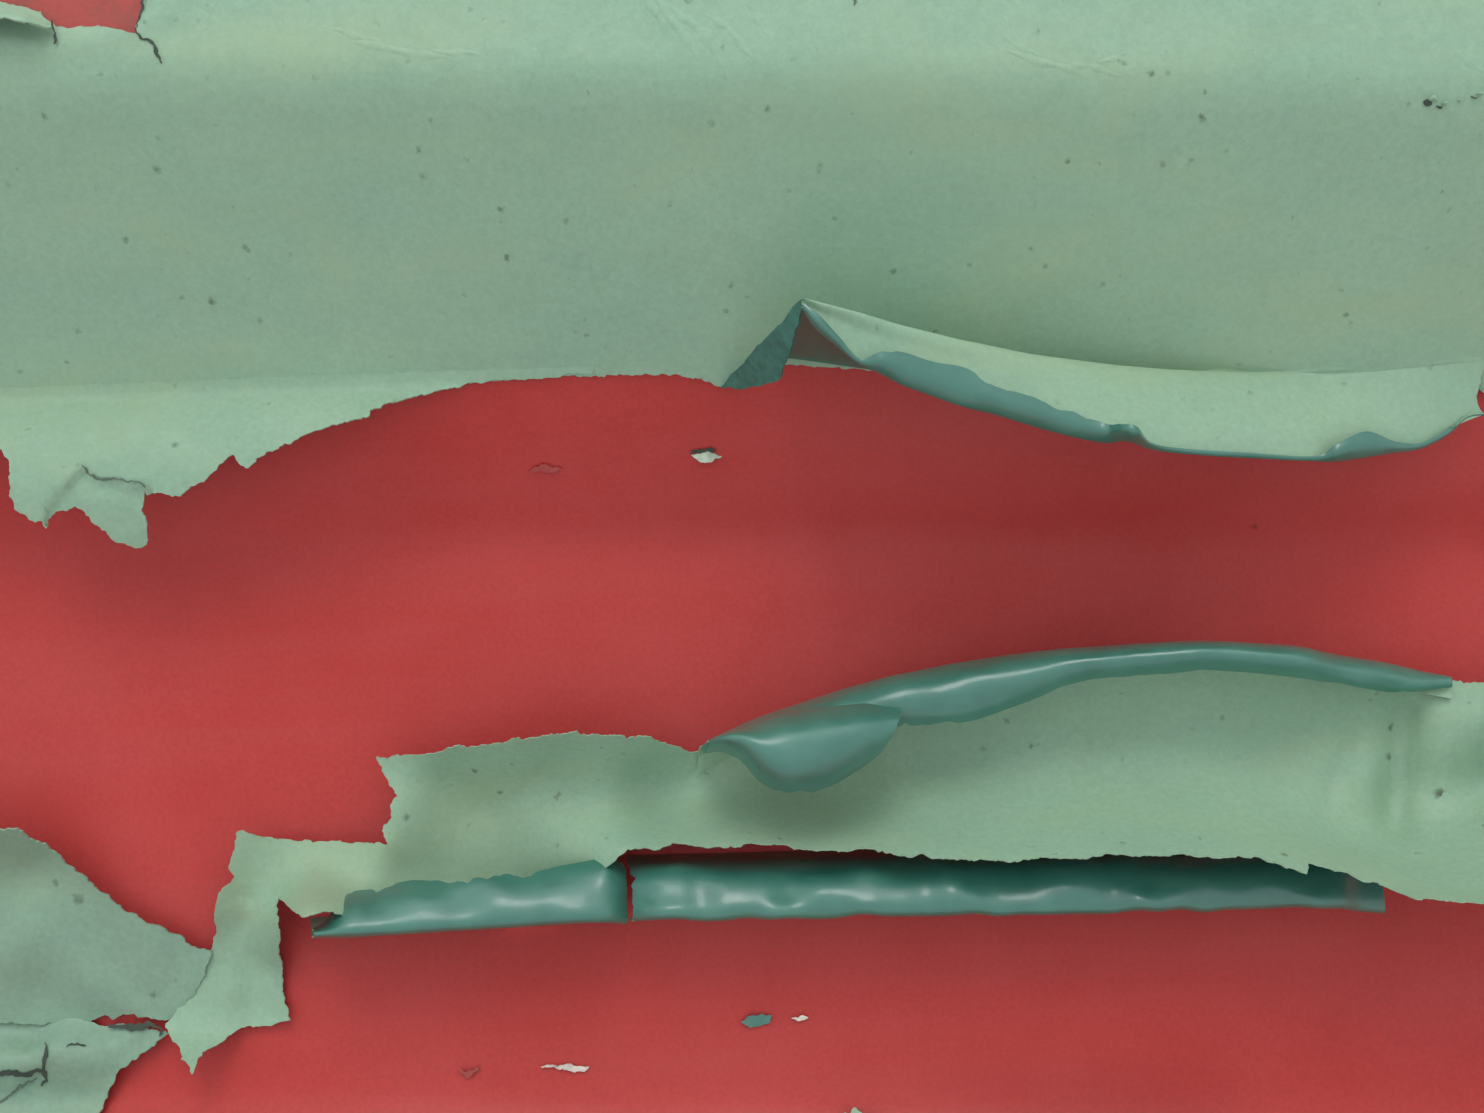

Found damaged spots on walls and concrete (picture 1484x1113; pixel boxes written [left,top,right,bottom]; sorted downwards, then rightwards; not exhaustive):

peeling [0,0,144,44]
peeling [0,367,594,548]
peeling [690,447,722,463]
peeling [721,297,1484,462]
peeling [0,641,1484,1113]